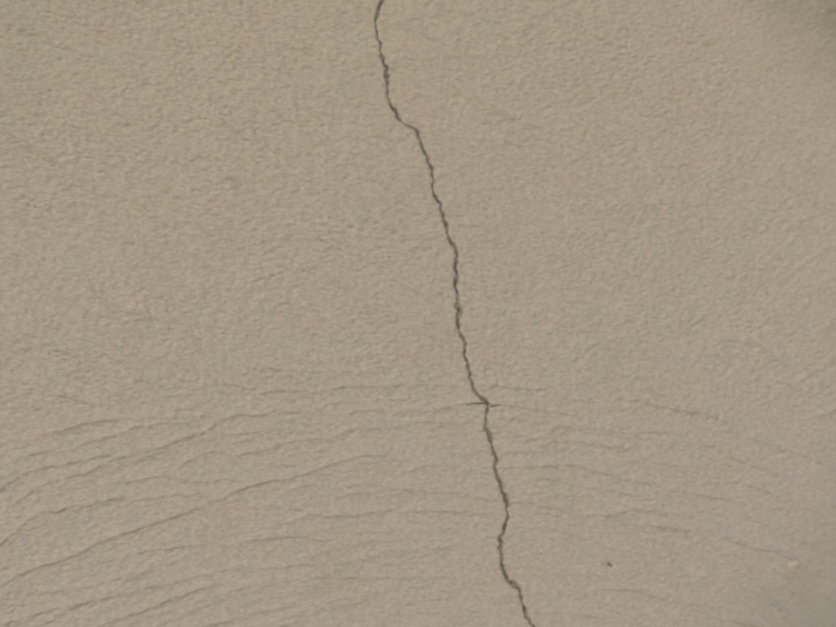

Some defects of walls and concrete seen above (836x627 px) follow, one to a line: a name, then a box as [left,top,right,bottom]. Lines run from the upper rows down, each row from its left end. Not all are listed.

crack [374,0,536,627]